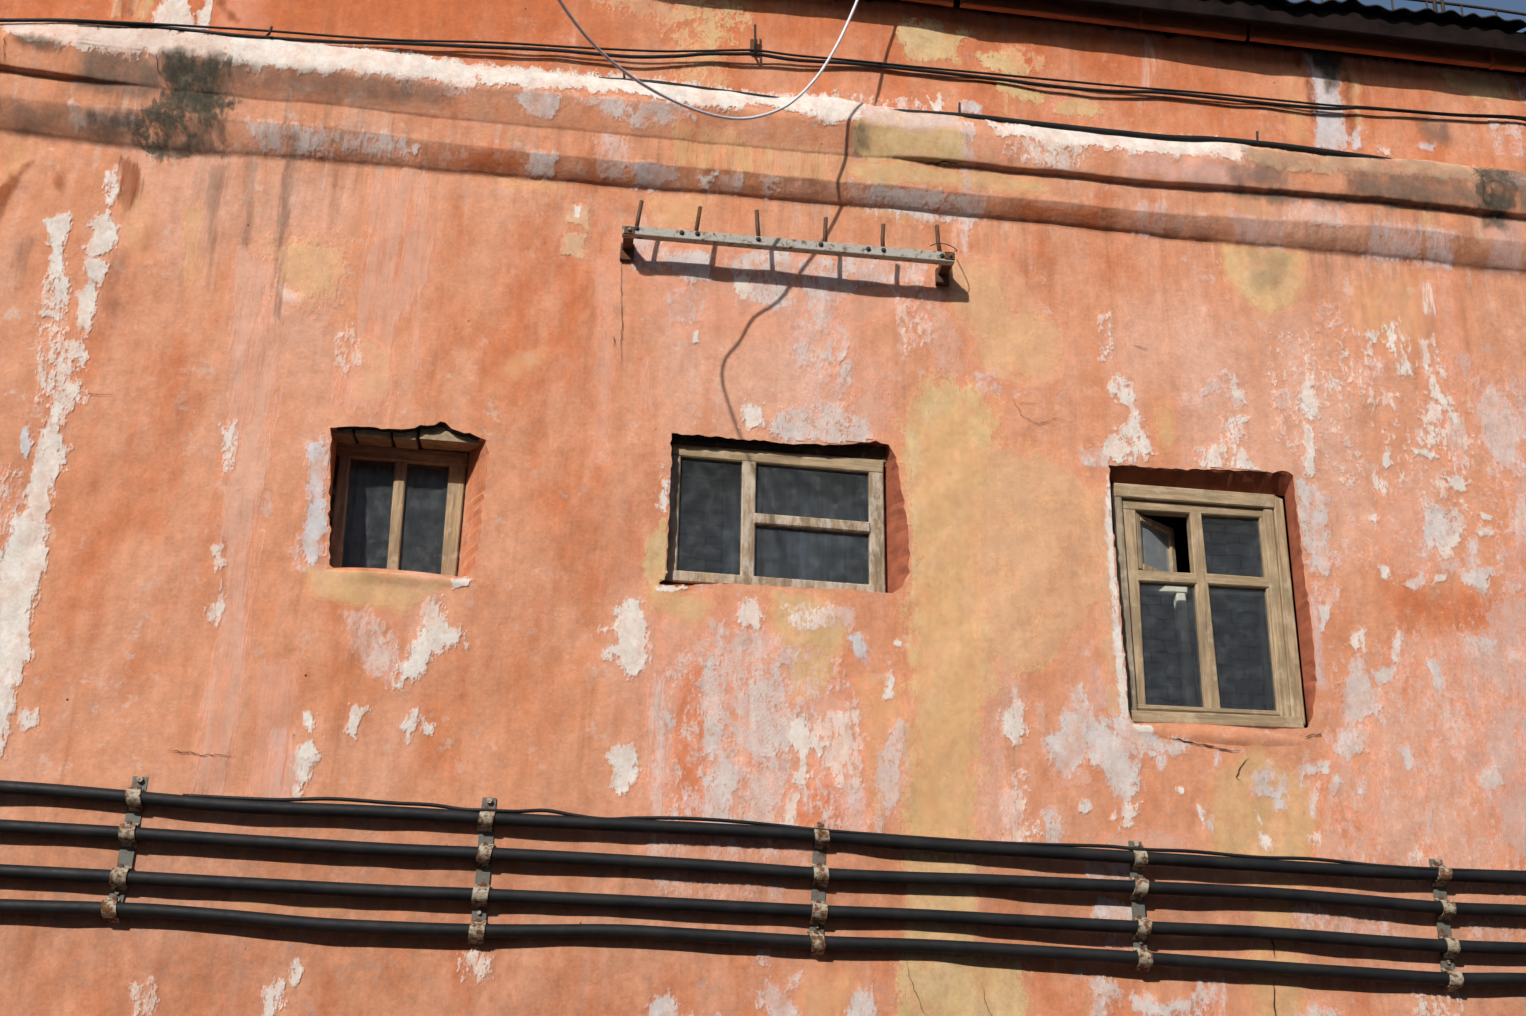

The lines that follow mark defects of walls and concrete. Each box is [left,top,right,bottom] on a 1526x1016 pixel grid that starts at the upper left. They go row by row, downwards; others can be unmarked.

damp [78,0,242,207]
peeling [3,0,1526,259]
damp [1238,188,1289,201]
damp [1302,168,1526,272]
peeling [0,164,121,758]
peeling [295,435,471,693]
peeling [597,239,1191,857]
peeling [1175,282,1526,866]
peeling [893,850,1033,1016]
peeling [1091,893,1132,920]
crack [1269,940,1277,1016]
peeling [1251,881,1388,1016]